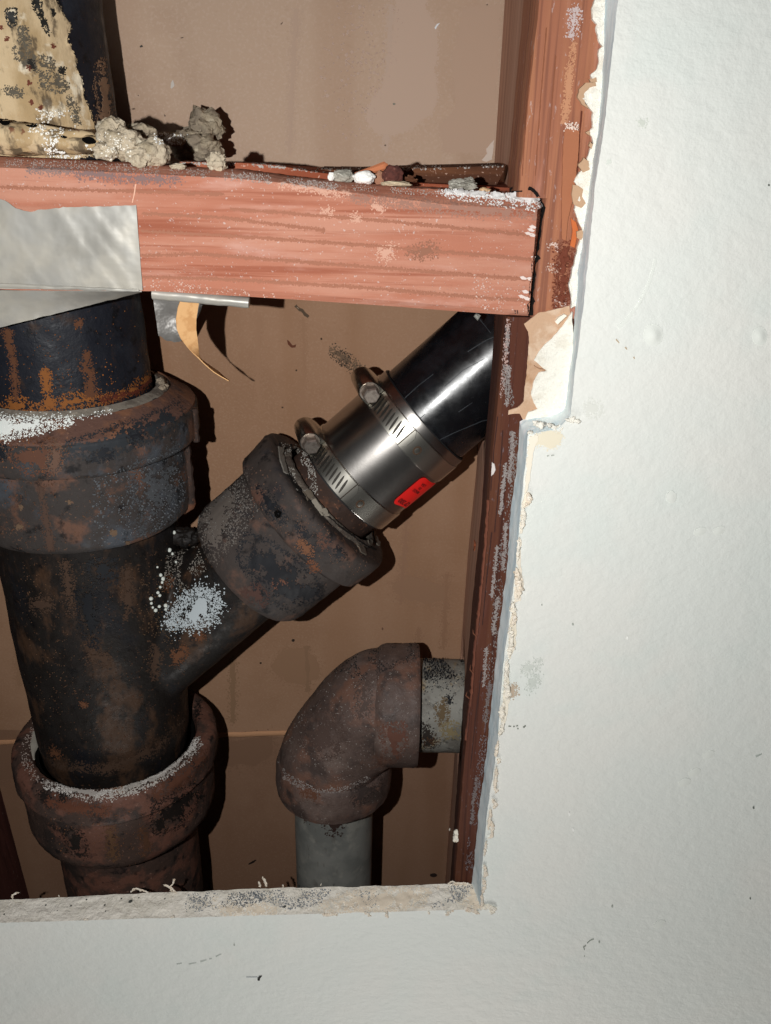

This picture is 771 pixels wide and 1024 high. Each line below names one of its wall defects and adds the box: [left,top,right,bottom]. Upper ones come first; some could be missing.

peeling [508,434,538,660]